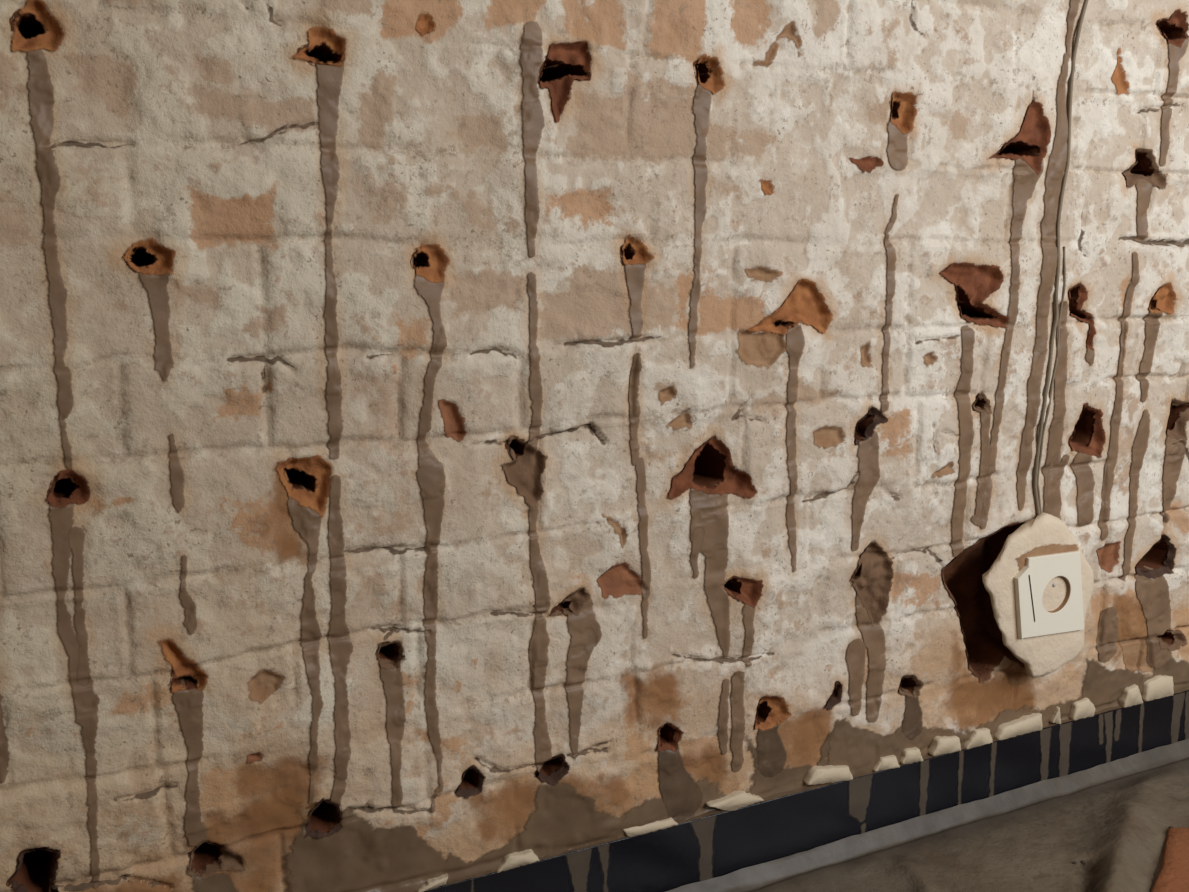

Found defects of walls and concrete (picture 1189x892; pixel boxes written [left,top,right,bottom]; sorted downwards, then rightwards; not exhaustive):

leakage [306,45,344,459]
leakage [414,261,447,813]
leakage [283,469,728,892]
leakage [520,21,545,257]
spalling [540,40,592,122]
leakage [621,250,651,639]
spalling [668,435,758,499]
spalling [746,266,783,282]
spalling [737,279,833,368]
leakage [689,0,1189,834]
spalling [940,262,1009,328]
spalling [942,522,1025,684]